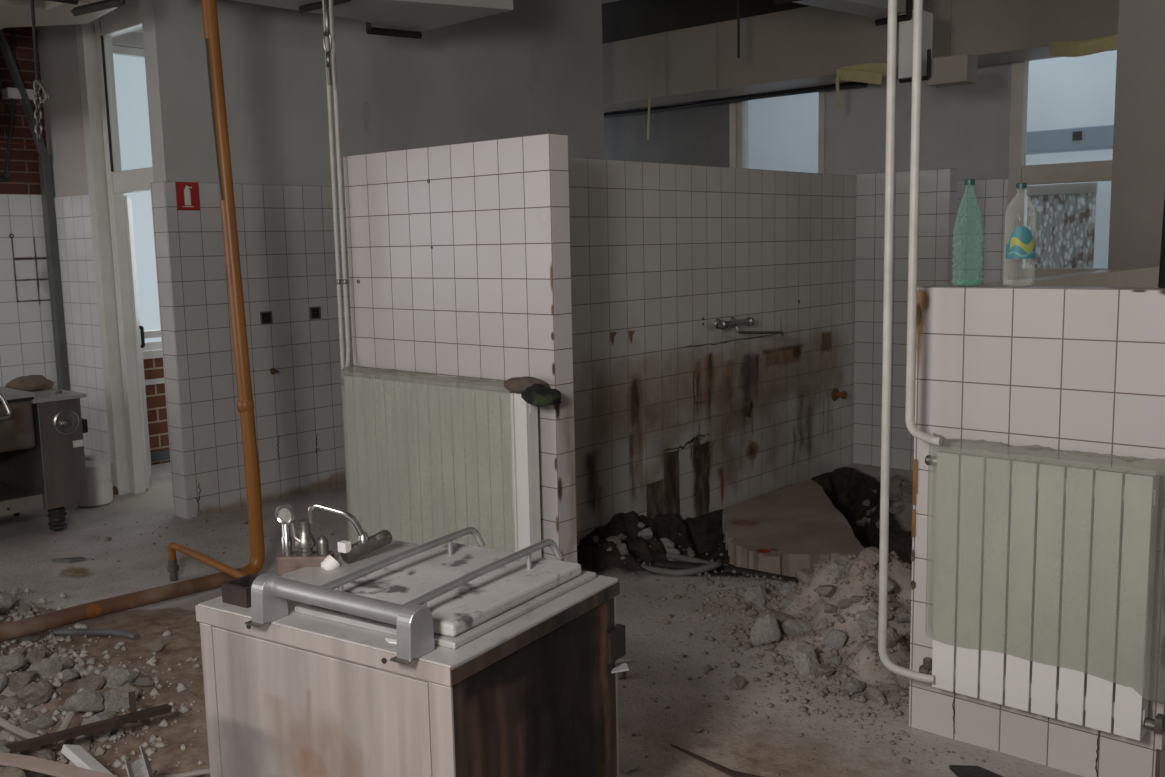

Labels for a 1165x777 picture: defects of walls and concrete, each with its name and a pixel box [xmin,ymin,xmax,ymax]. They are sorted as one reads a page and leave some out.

peeling [646,450,680,520]
peeling [693,437,710,518]